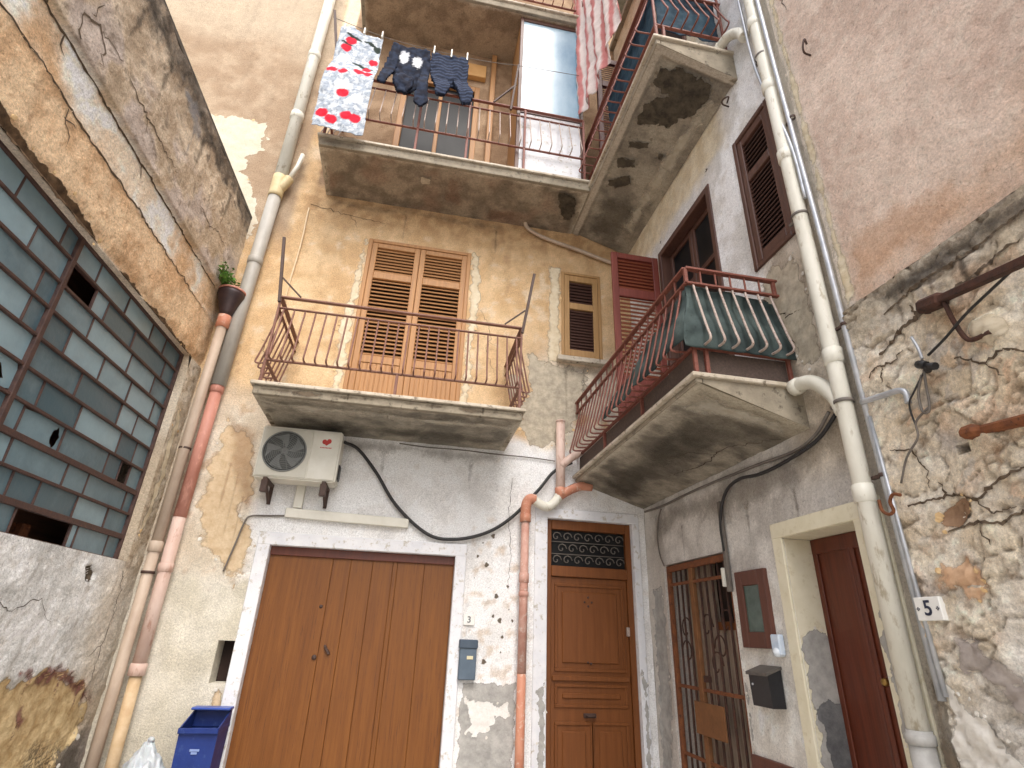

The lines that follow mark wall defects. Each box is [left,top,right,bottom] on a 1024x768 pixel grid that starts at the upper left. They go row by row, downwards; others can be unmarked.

crack [0,0,215,312]
flaking render [211,114,270,239]
crack [869,209,1024,382]
water stain [688,399,780,430]
flaking render [195,418,256,588]
spalling [935,557,988,603]
flaking render [0,667,87,768]
peeling [464,696,510,739]